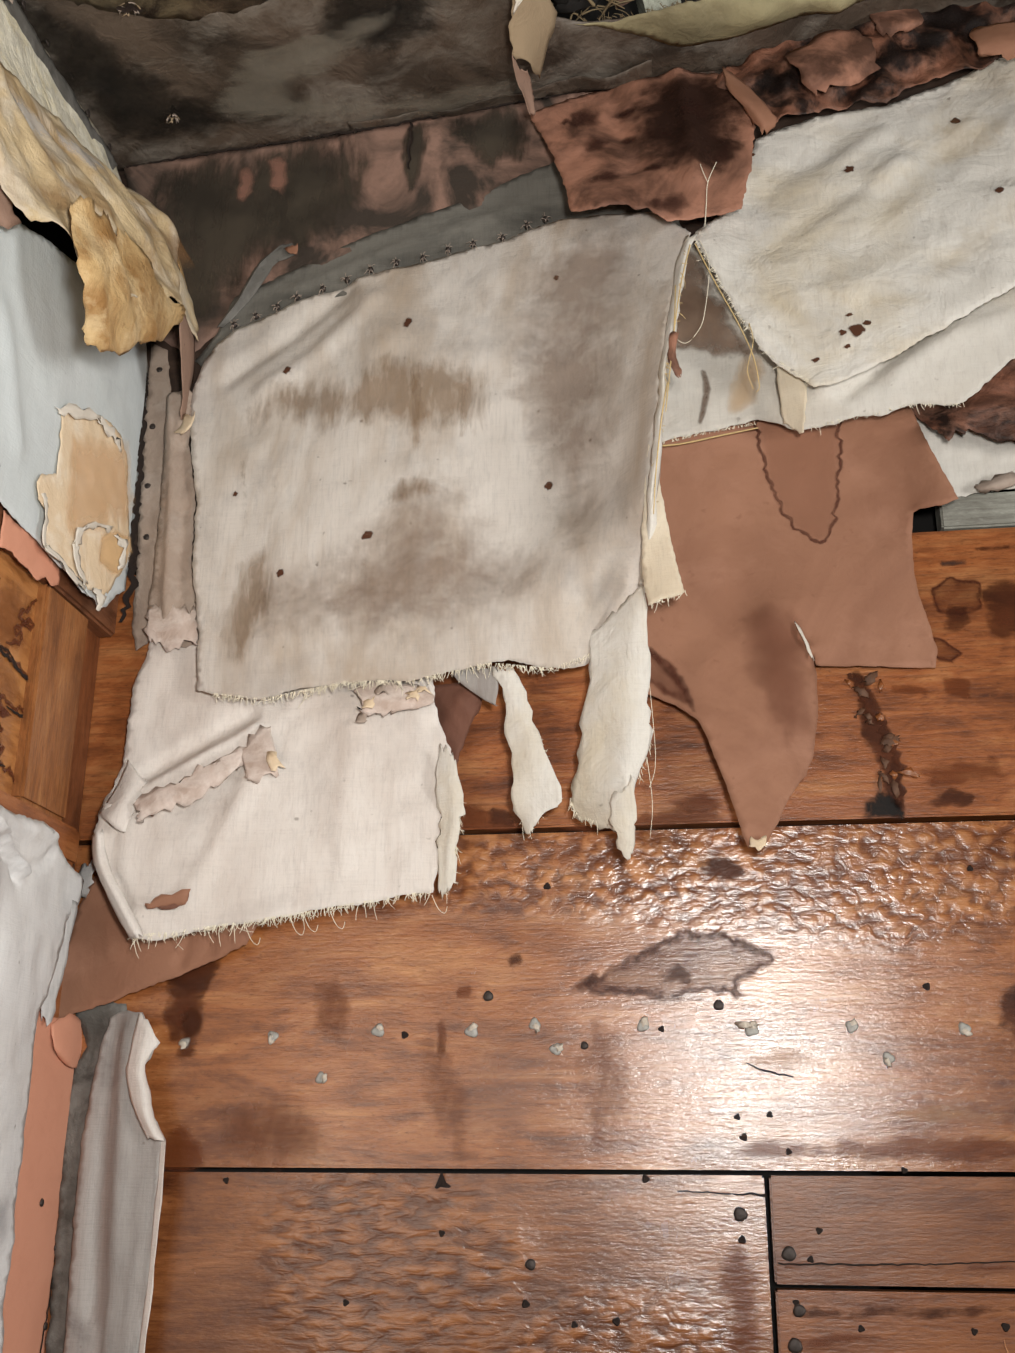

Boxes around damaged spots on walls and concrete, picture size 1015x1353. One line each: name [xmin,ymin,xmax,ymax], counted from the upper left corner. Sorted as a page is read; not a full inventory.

peeling [36,403,131,611]
damp [932,562,1015,662]
crack [0,645,28,718]
damp [577,930,774,999]